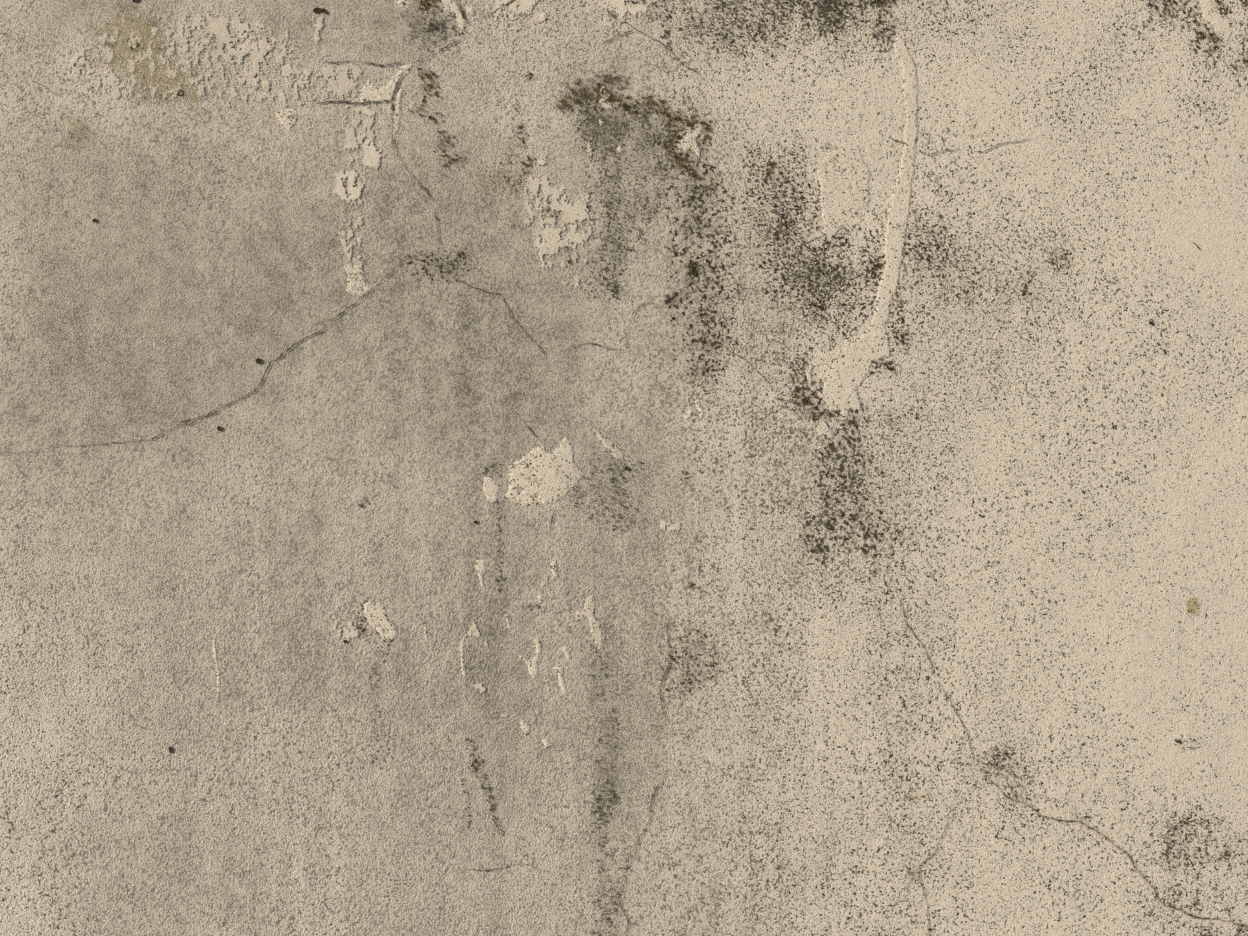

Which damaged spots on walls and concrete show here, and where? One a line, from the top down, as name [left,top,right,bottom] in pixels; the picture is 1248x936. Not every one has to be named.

water stain [611,0,895,58]
peeling [68,0,413,297]
peeling [523,152,592,293]
water stain [552,69,1036,387]
crack [29,258,405,452]
peeling [482,437,585,506]
water stain [566,445,649,536]
water stain [788,354,886,565]
peeling [325,601,398,644]
water stain [588,632,631,936]
water stain [661,624,729,700]
crack [888,578,1248,936]